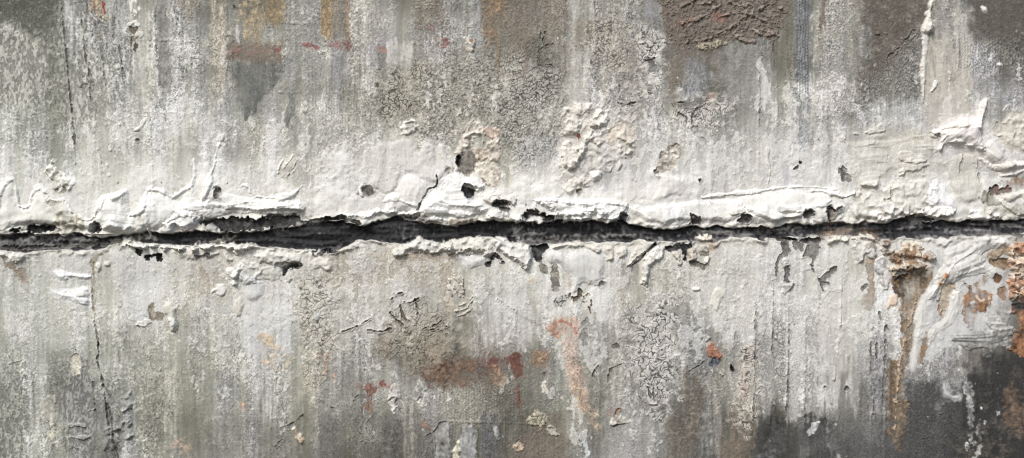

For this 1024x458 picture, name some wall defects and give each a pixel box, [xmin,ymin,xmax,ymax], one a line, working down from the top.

peeling [654,0,791,67]
leakage [229,61,283,120]
spalling [446,120,504,187]
spalling [775,237,837,294]
rust [416,349,549,408]
crack [0,175,1024,458]
rust [546,315,602,430]
leakage [749,404,835,458]
rust [861,233,1024,452]
leakage [947,358,1024,458]